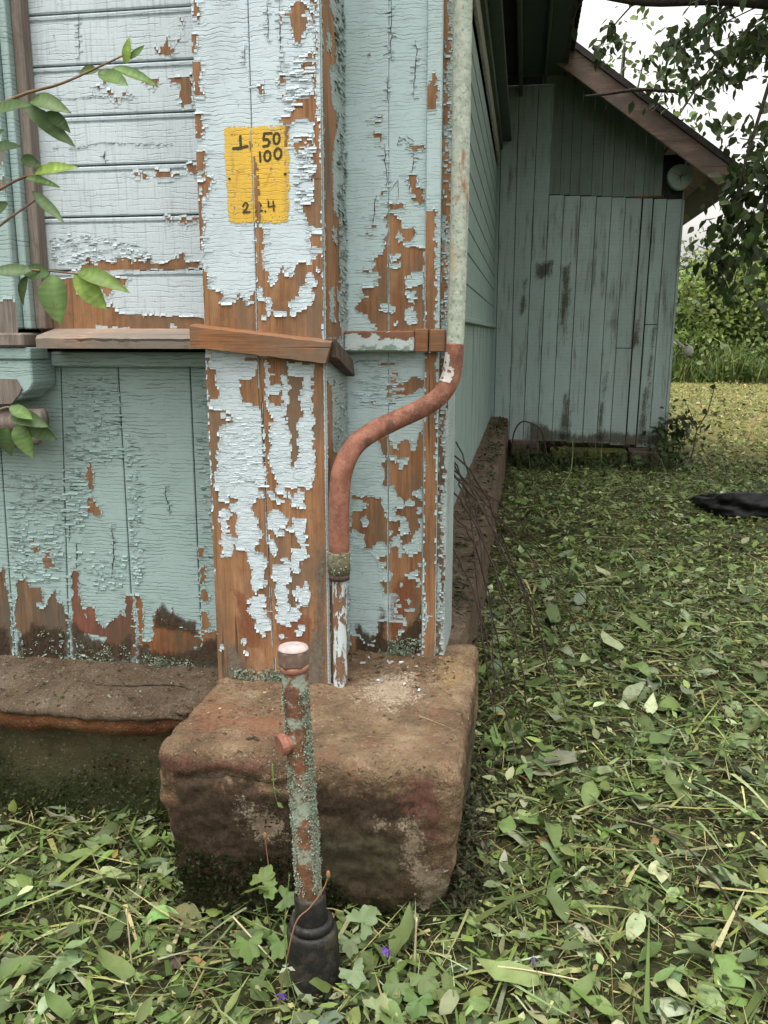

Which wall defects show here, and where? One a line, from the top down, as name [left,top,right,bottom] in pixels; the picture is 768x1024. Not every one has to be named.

peeling [38,0,343,342]
peeling [355,0,454,408]
water stain [0,622,245,679]
peeling [0,354,338,684]
water stain [153,605,196,634]
peeling [347,402,448,657]
corrosion [391,577,416,639]